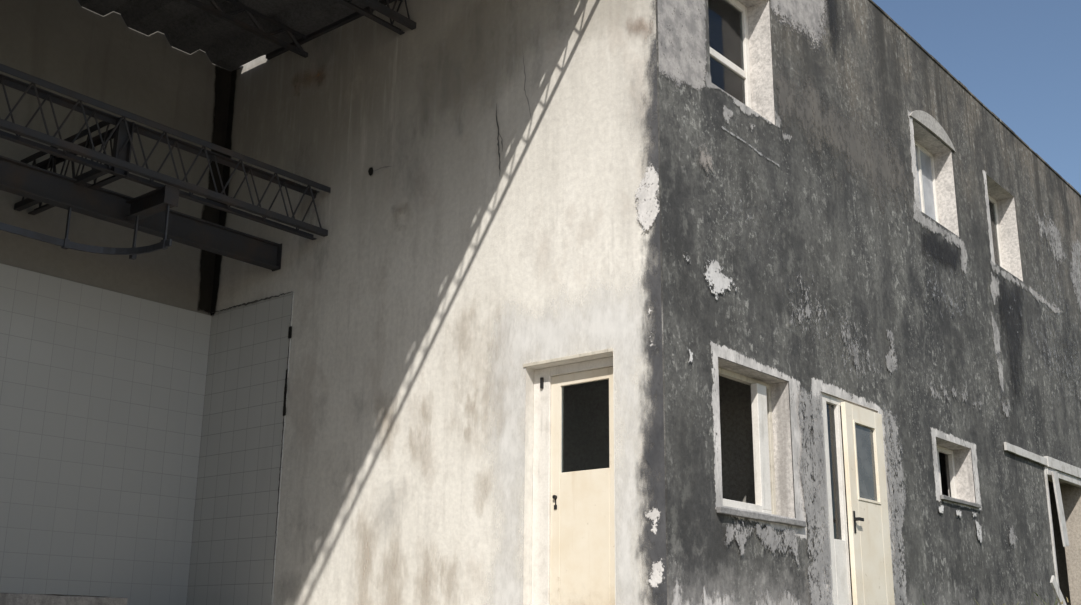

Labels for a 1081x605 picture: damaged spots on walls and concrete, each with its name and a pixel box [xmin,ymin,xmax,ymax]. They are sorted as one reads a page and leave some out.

leakage [827,0,837,53]
crack [495,106,503,175]
peeling [633,162,660,232]
leakage [923,234,957,268]
spalling [704,260,737,300]
leakage [637,37,734,605]
leakage [992,283,1023,403]
spalling [645,508,661,534]
spalling [648,558,665,587]
leakage [756,591,800,605]